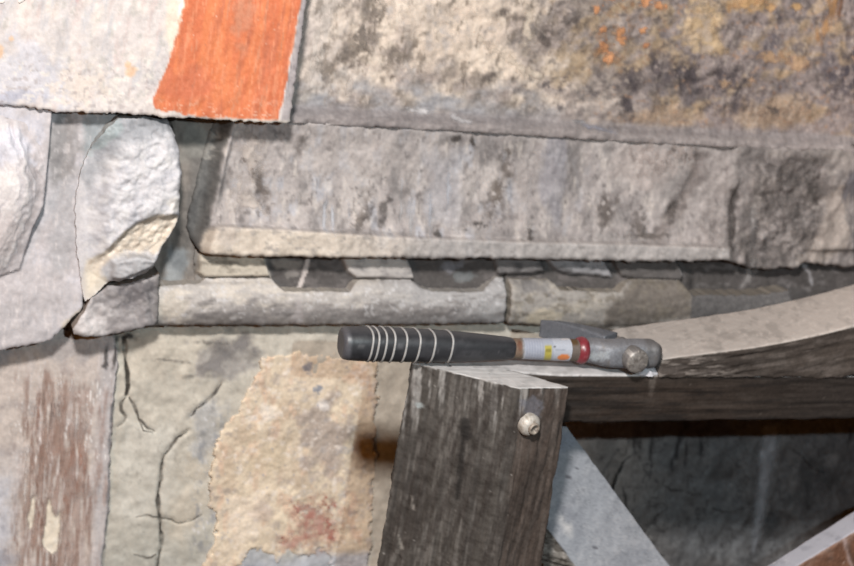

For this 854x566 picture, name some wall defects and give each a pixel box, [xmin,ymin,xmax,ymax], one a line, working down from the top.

crack [111,336,150,431]
crack [147,382,222,566]
flaking render [202,350,380,566]
crack [611,460,627,506]